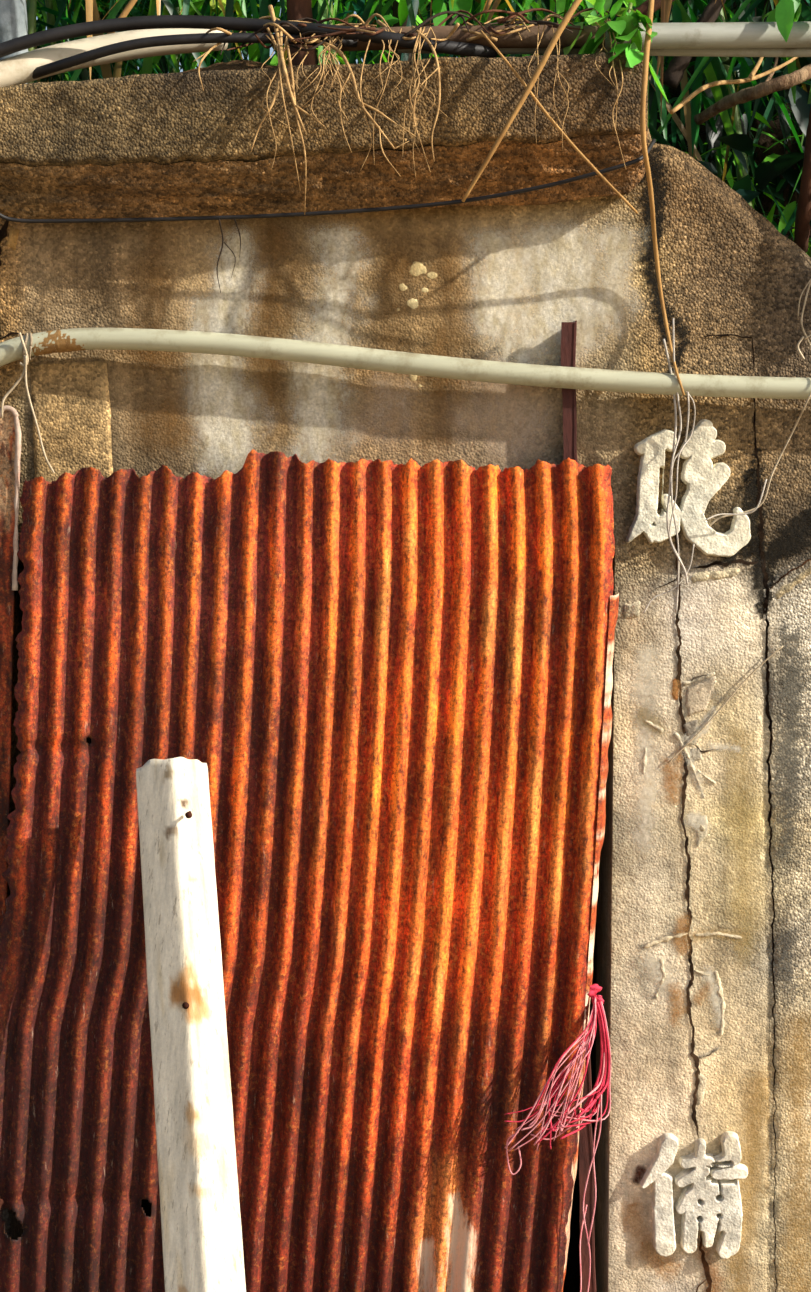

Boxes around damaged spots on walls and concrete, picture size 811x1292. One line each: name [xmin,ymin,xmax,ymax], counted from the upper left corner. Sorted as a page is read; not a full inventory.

crack [0,215,20,266]
water stain [719,442,811,619]
crack [657,334,811,1292]
water stain [768,627,811,862]